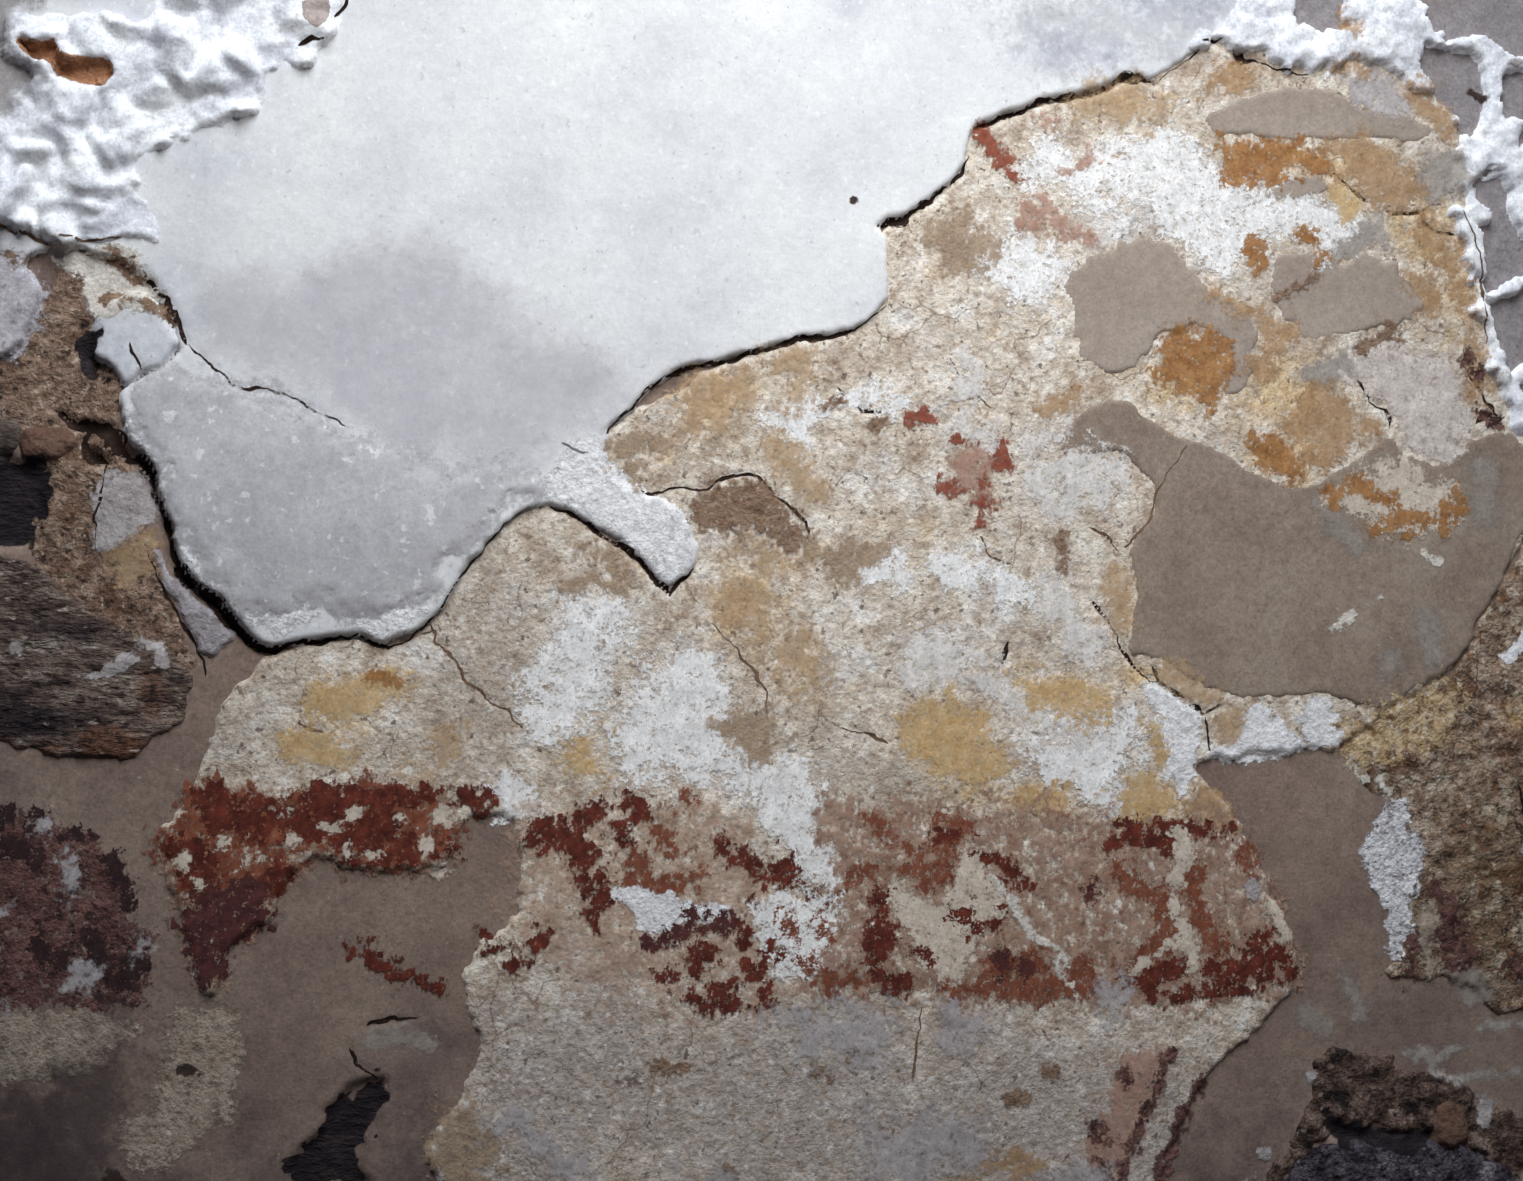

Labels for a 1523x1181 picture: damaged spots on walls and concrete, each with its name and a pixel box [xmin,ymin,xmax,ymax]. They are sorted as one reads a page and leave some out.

peeling [302,0,330,27]
spalling [1466,88,1487,104]
water stain [1415,144,1476,208]
crack [0,223,121,257]
peeling [968,218,1075,325]
peeling [1005,118,1373,302]
water stain [1331,211,1393,265]
crack [129,343,142,370]
crack [143,270,345,426]
water stain [1300,345,1354,387]
flaking render [0,239,320,761]
peeling [0,318,1523,1181]